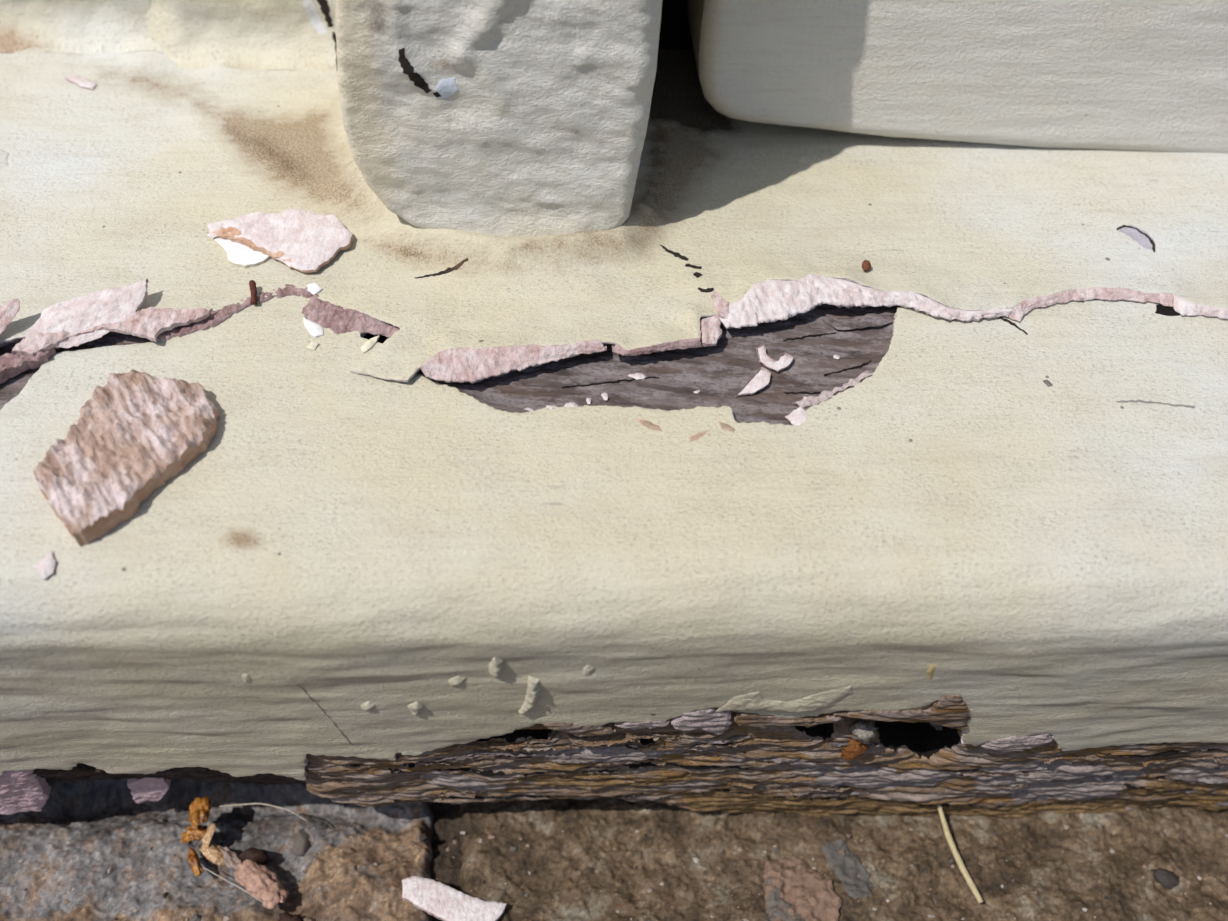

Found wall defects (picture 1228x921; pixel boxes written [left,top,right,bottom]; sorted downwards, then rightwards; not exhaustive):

crack [317,0,337,65]
peeling [0,278,400,410]
peeling [416,273,1228,426]